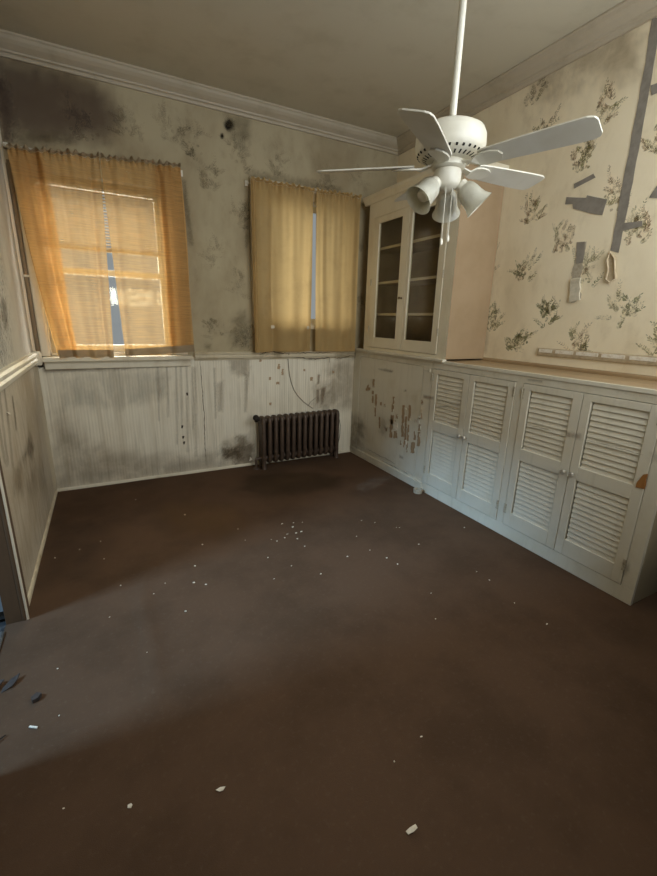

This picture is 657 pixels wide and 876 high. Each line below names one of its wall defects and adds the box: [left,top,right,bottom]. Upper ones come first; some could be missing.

damp [0,68,106,140]
peeling [366,379,423,454]